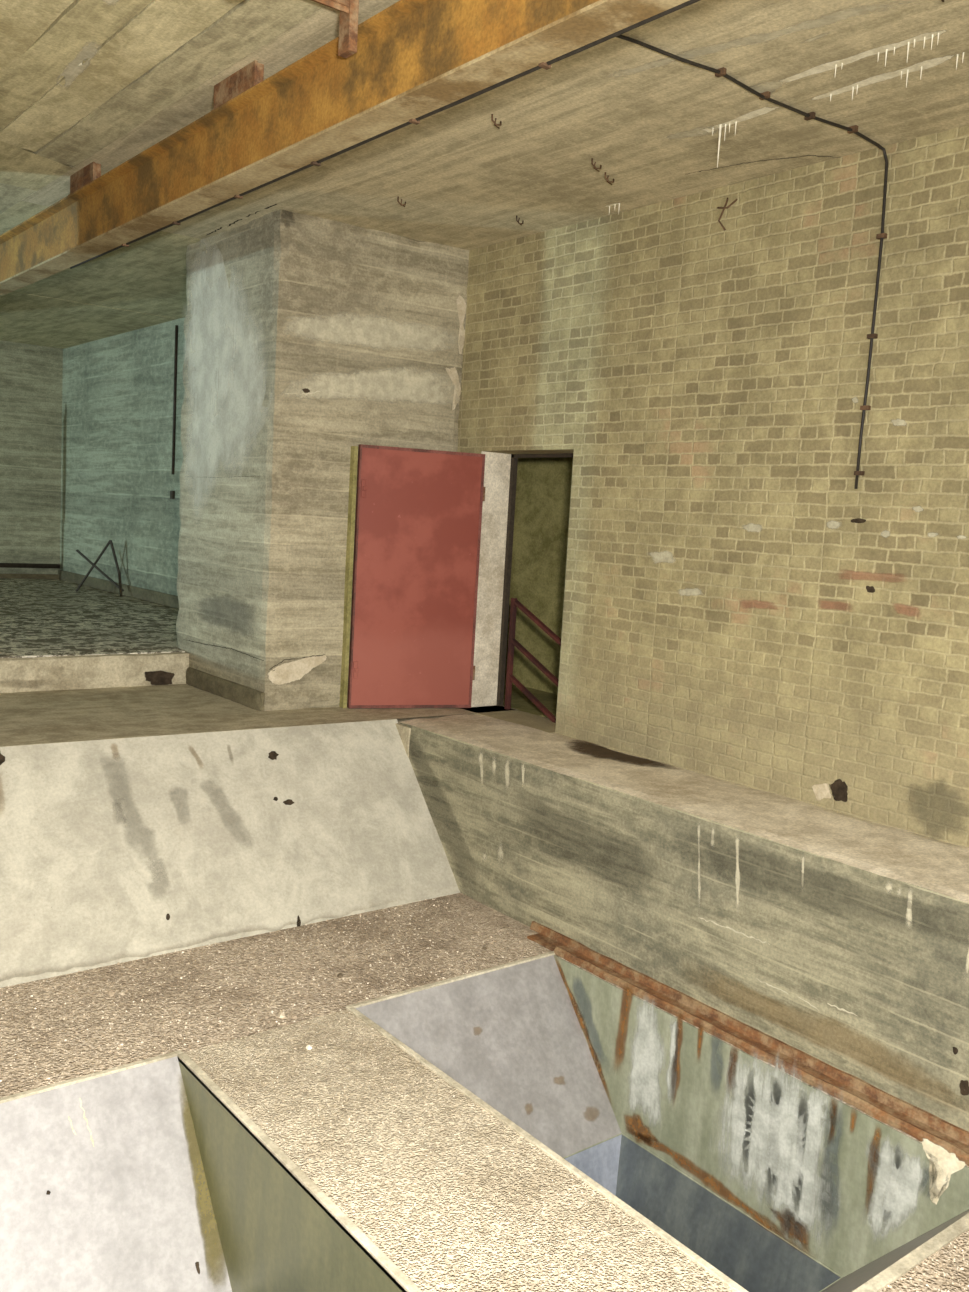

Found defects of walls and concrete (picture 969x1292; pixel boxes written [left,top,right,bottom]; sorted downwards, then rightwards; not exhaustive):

spalling [268,654,327,685]
leakage [698,825,714,898]
leakage [886,884,912,924]
corrosion [557,962,608,1093]
corrosion [616,987,632,1061]
corrosion [672,1014,682,1091]
corrosion [728,1049,737,1086]
corrosion [830,1101,856,1137]
corrosion [626,1116,807,1248]
corrosion [867,1130,880,1205]
peeling [922,1139,967,1205]